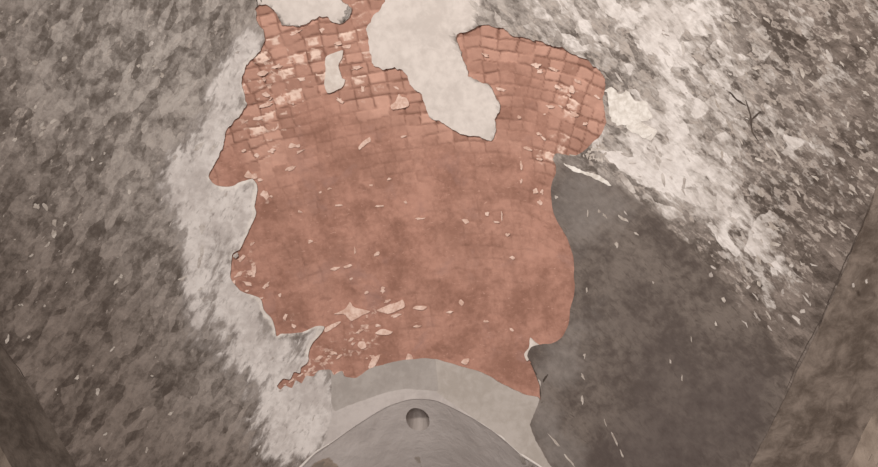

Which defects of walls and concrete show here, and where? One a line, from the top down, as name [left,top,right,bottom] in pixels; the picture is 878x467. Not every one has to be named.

peeling [0,82,104,273]
flaking render [126,0,657,467]
damp [443,0,878,467]